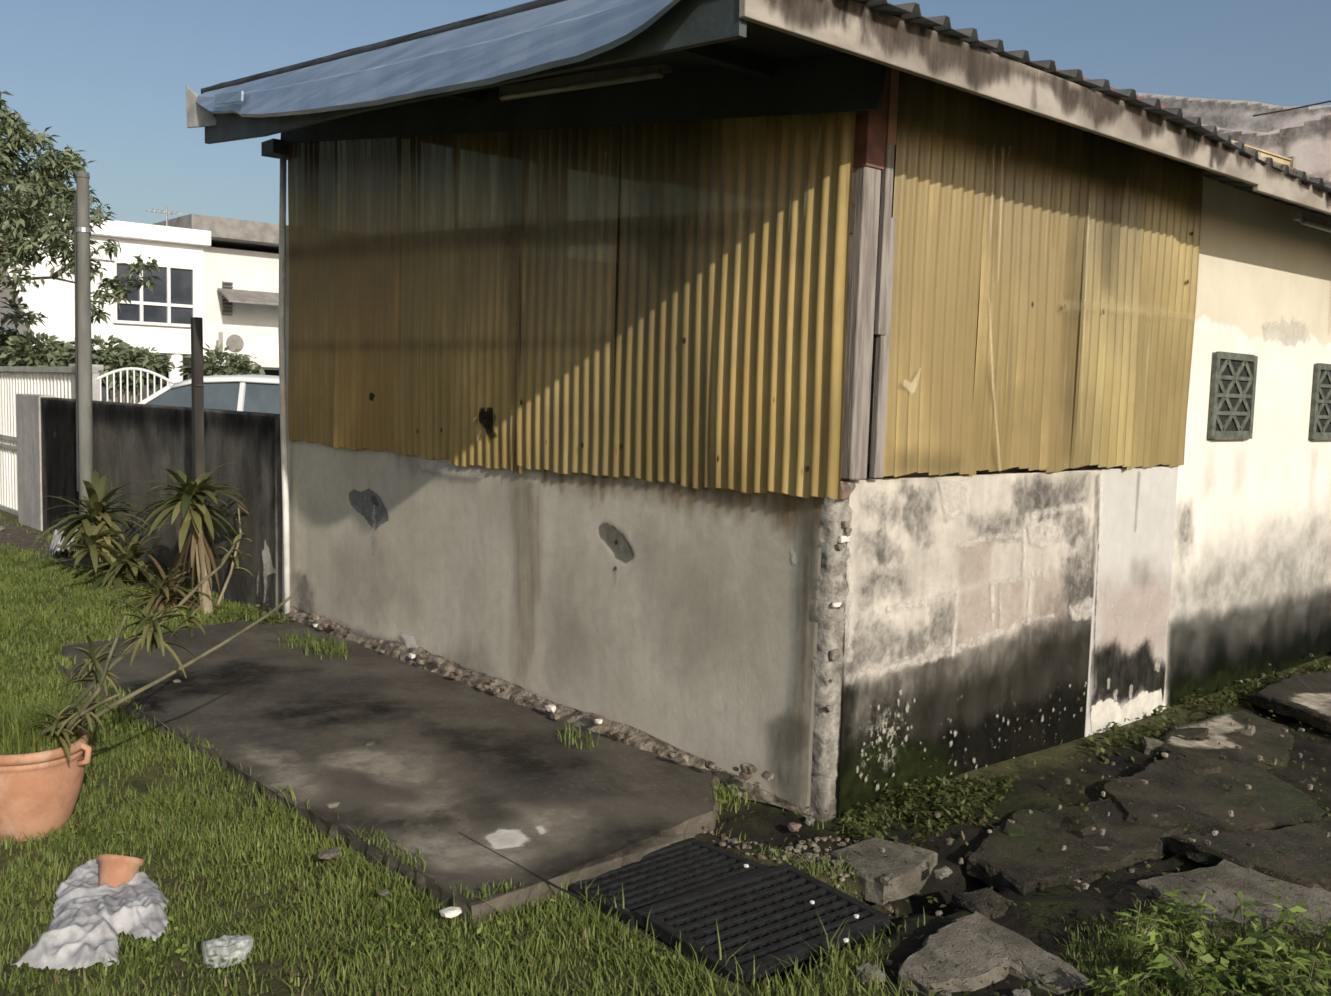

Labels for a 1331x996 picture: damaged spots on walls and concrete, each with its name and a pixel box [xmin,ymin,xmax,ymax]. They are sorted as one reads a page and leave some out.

leakage [770,0,1331,187]
spalling [808,481,987,822]
leakage [837,481,1331,818]